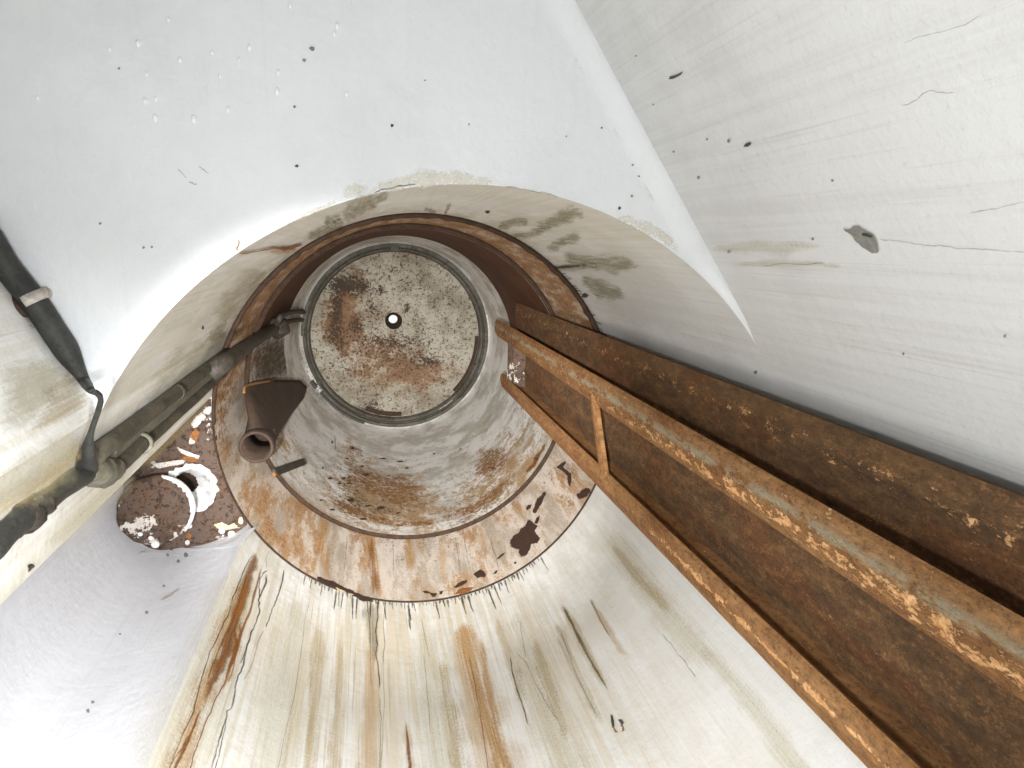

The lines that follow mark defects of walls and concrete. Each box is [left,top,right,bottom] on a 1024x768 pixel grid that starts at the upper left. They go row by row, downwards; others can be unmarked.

rust [240,244,301,254]
damp [516,238,606,336]
rust [336,500,432,526]
rust [353,468,421,506]
rust [444,447,513,521]
peeling [556,461,591,499]
rust [169,556,261,768]
crack [172,561,284,768]